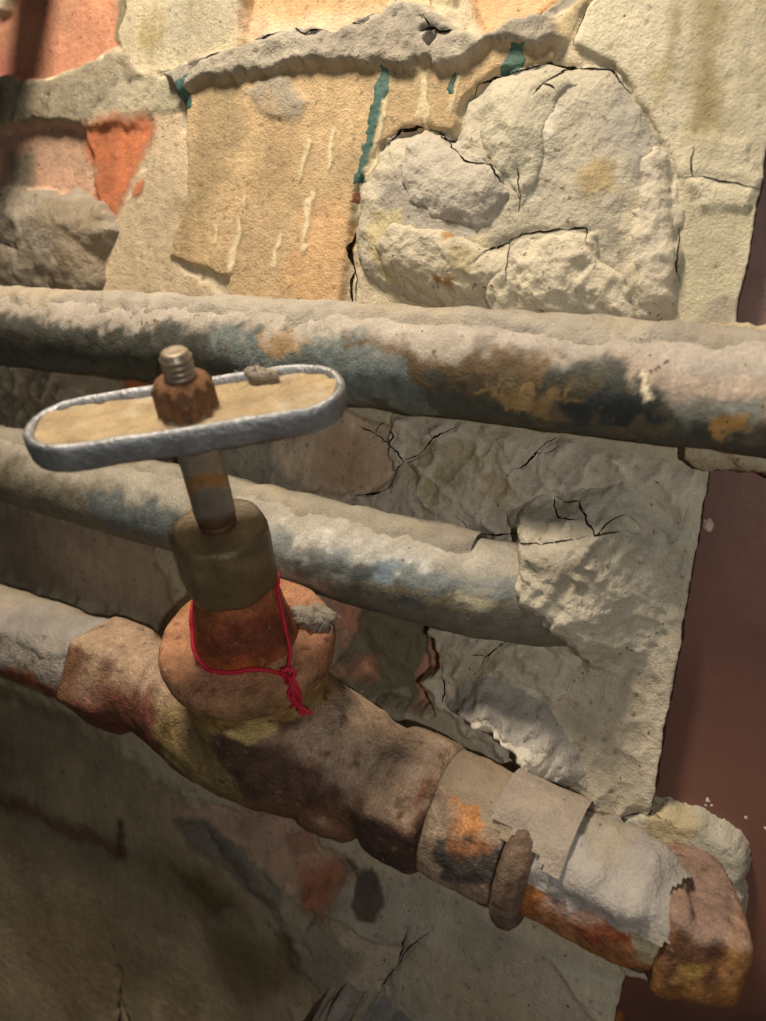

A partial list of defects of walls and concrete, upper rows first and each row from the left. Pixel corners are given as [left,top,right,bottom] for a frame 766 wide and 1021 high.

peeling [175,73,192,109]
peeling [447,72,459,94]
peeling [500,41,529,78]
peeling [349,64,390,204]
flaking render [85,116,153,214]
crack [350,418,455,496]
crack [513,437,557,469]
crack [453,496,627,545]